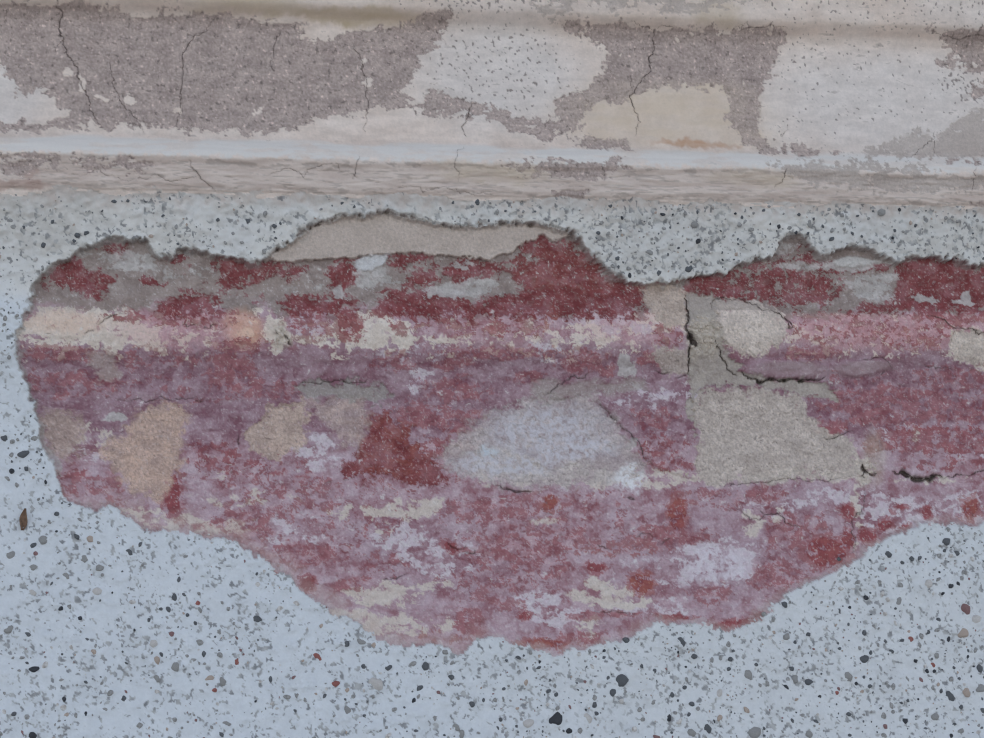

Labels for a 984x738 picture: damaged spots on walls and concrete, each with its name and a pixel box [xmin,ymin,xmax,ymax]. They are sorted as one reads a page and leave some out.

peeling [0,0,984,208]
crack [620,22,673,126]
spalling [12,209,984,659]
crack [661,296,823,384]